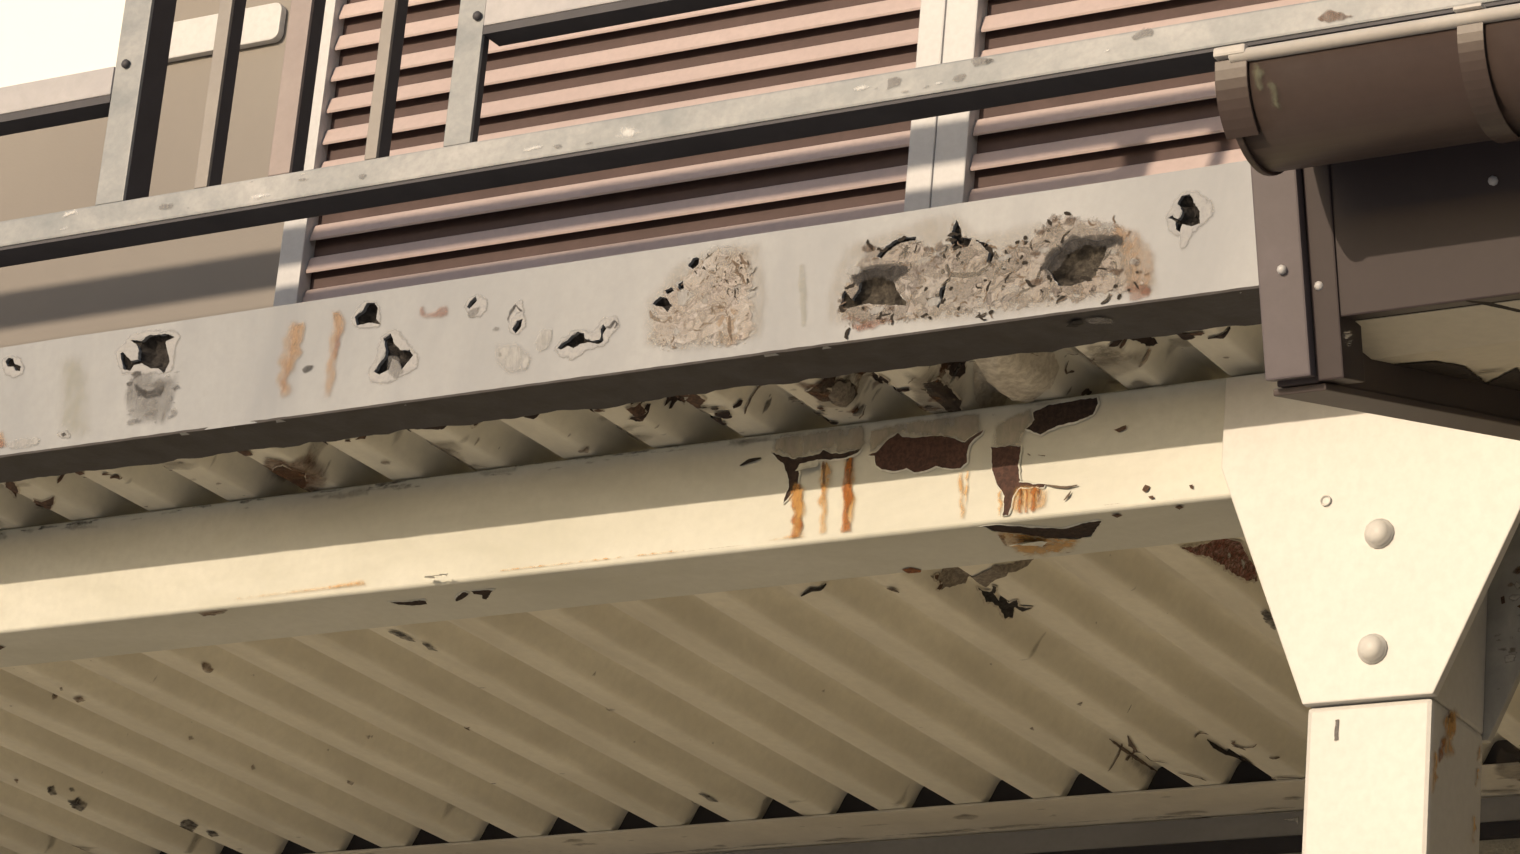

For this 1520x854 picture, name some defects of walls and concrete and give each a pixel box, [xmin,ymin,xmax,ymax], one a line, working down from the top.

spalling [123,335,174,398]
corrosion [279,312,343,391]
spalling [358,304,413,375]
spalling [561,327,606,349]
spalling [648,246,757,352]
spalling [839,211,1151,339]
peeling [770,361,1122,592]
corrosion [1435,712,1456,781]